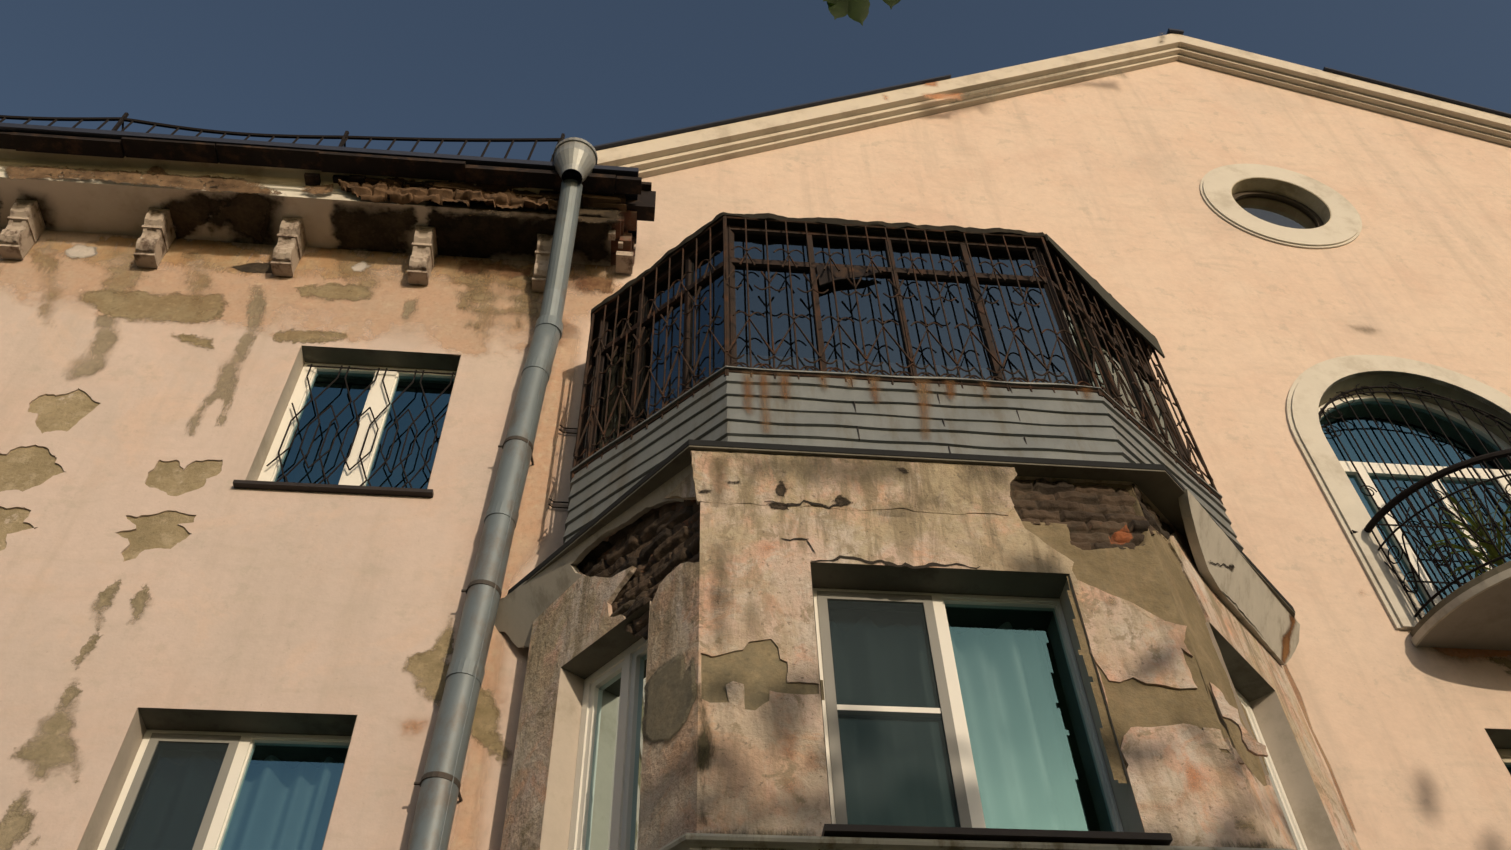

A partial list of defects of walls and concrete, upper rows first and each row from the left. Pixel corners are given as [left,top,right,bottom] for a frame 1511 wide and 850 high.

spalling [302,177,560,211]
water stain [0,193,556,354]
peeling [0,289,228,561]
peeling [188,263,348,435]
water stain [500,214,621,599]
spalling [404,627,454,704]
water stain [481,625,501,697]
spalling [577,490,711,640]
spalling [641,640,825,743]
crack [764,500,980,569]
spalling [1010,478,1270,786]
water stain [452,737,487,850]